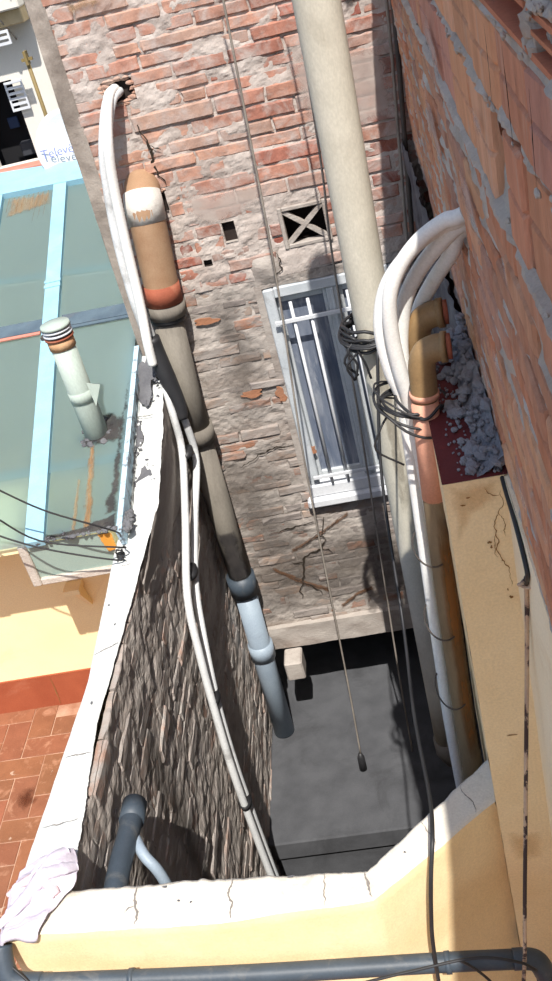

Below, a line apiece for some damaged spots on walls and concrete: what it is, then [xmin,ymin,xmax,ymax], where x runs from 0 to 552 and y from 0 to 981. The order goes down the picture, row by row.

crack [137,125,166,184]
rust [74,447,94,527]
crack [269,517,333,599]
crack [485,489,513,584]
crack [126,888,138,923]
crack [226,878,234,918]
crack [364,871,373,897]